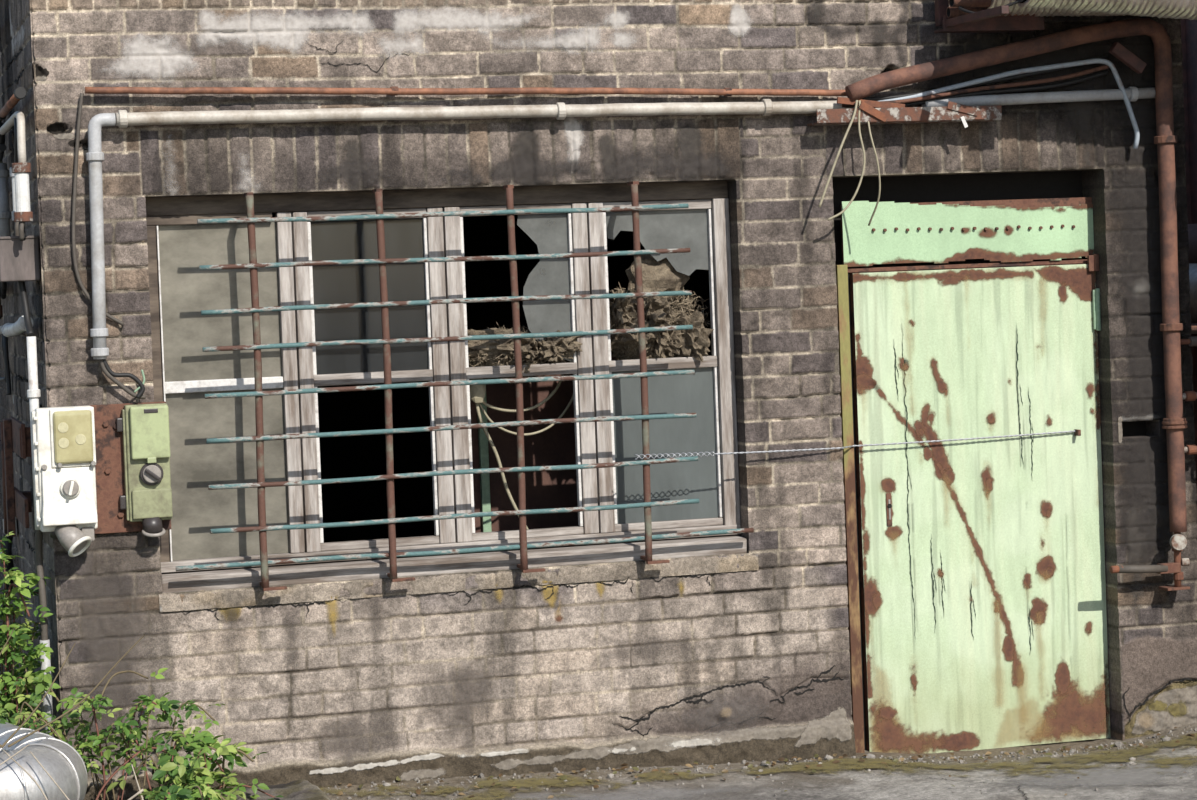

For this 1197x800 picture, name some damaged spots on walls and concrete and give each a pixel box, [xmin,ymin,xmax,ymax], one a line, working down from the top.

corrosion [1086,318,1101,429]
corrosion [855,334,1024,687]
corrosion [1041,501,1053,518]
corrosion [859,440,980,754]
corrosion [1023,540,1056,624]
crack [613,665,846,736]
corrosion [1031,662,1110,742]